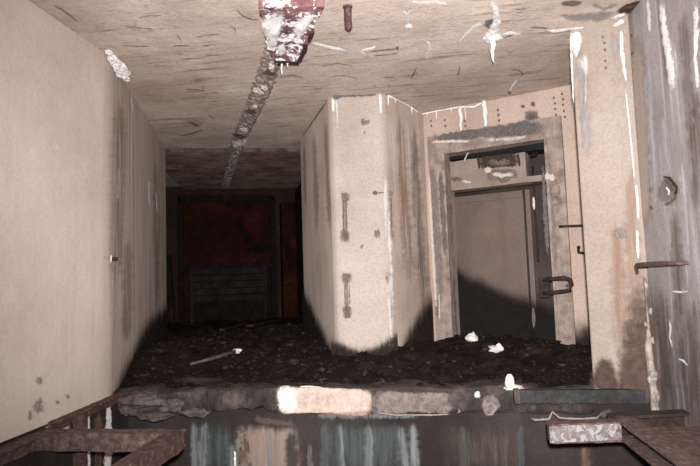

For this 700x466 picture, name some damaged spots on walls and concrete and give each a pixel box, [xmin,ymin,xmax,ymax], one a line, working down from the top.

crack [177,10,256,56]
water stain [458,1,521,43]
water stain [646,1,678,91]
water stain [433,102,541,143]
rust [614,235,654,403]
water stain [191,417,299,466]
spalling [117,386,611,466]
water stain [319,413,419,466]